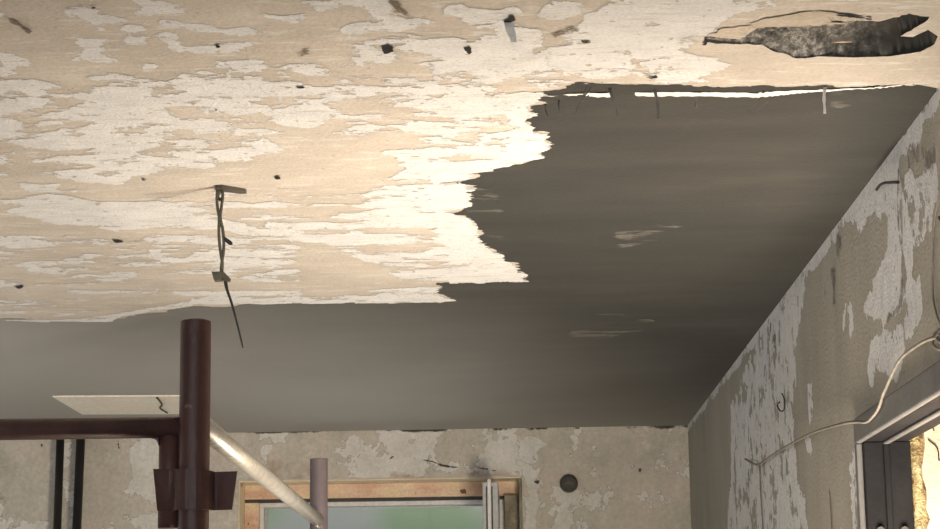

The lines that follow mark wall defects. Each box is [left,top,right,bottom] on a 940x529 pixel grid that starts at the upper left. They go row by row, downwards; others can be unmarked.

peeling [0,0,938,322]
peeling [666,87,940,529]
peeling [0,503,51,529]
peeling [63,441,75,529]
peeling [102,438,159,529]
peeling [259,432,290,466]
peeling [320,427,614,529]